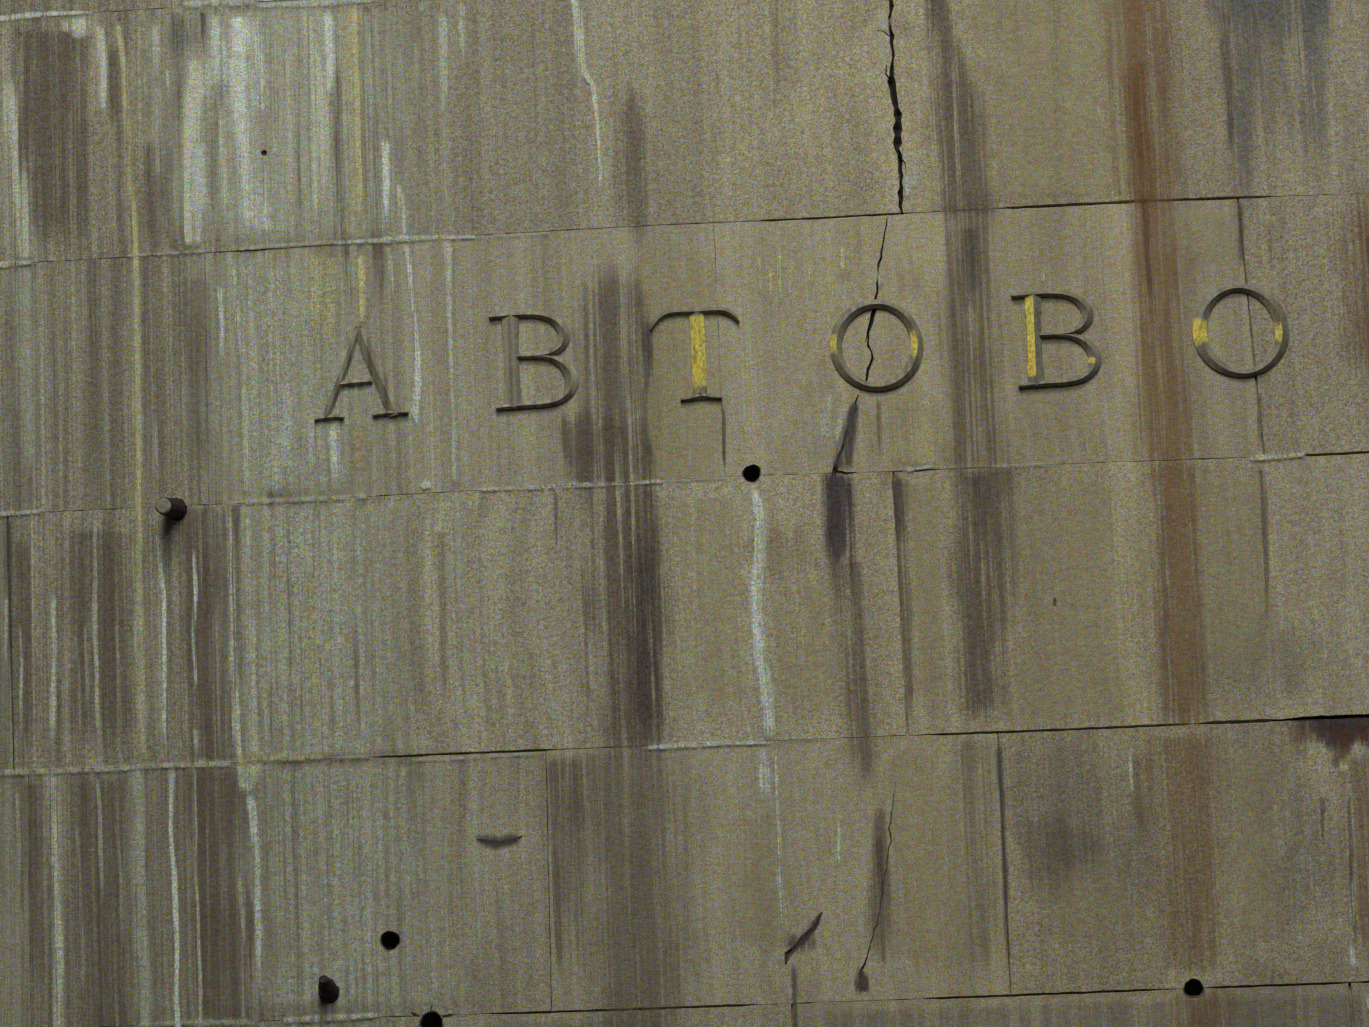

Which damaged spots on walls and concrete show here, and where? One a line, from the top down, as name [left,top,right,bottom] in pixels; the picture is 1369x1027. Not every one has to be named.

water stain [0,0,474,1027]
water stain [471,760,517,943]
water stain [571,0,602,187]
water stain [481,261,796,947]
water stain [818,395,869,760]
water stain [855,969,868,992]
crack [832,0,907,476]
crack [858,784,896,987]
water stain [877,399,938,533]
water stain [927,0,1012,711]
rust [1122,0,1179,460]
rust [1302,717,1369,756]